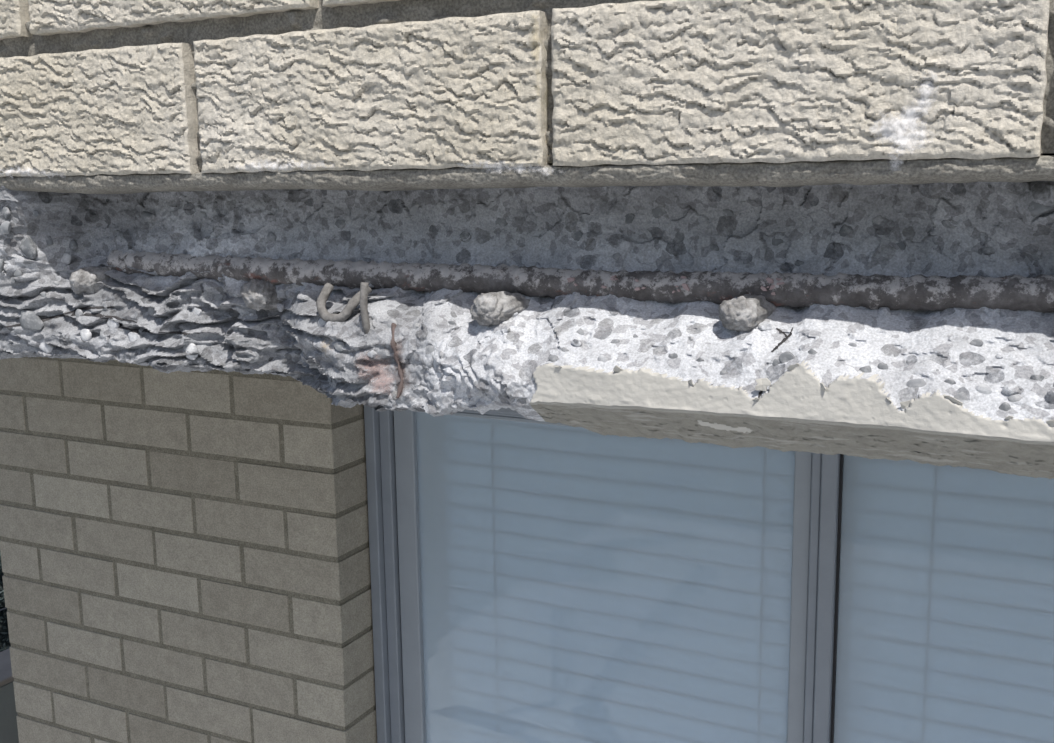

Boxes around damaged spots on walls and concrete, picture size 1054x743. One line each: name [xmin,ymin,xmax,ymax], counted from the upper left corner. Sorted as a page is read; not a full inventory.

spalling [0,181,1054,427]
spalling [697,420,753,433]